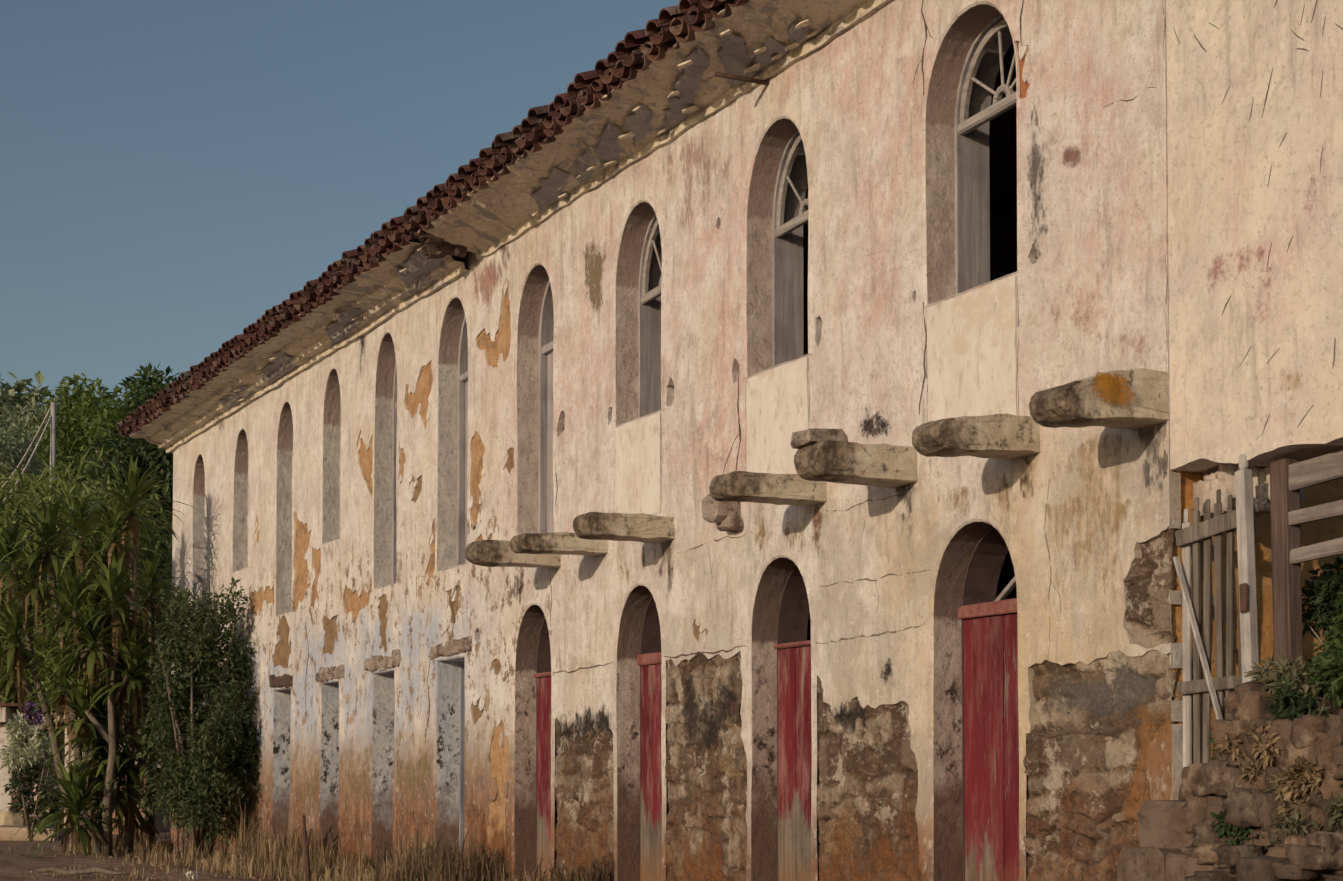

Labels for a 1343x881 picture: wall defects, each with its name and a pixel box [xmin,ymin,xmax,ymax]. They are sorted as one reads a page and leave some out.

peeling [531,16,830,216]
crack [913,0,936,96]
damp [1028,112,1047,255]
peeling [477,279,511,373]
crack [919,302,928,415]
peeling [468,431,514,542]
peeling [250,512,389,668]
flaking render [554,718,614,881]
flaking render [664,616,747,881]
flaking render [816,675,922,881]
flaking render [1023,528,1178,881]